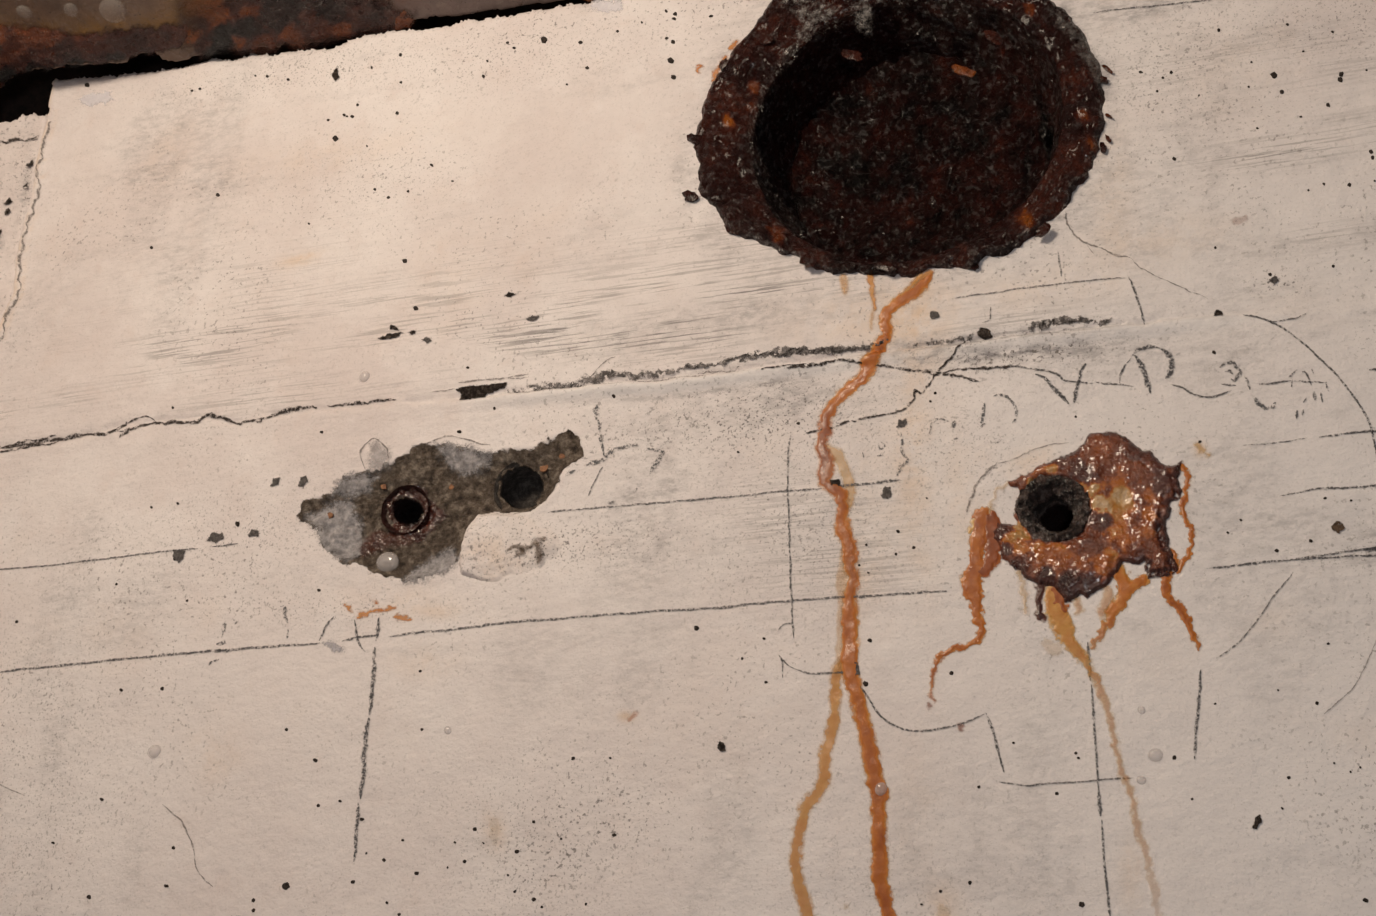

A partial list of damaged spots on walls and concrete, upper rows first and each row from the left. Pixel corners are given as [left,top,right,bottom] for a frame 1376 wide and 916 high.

corrosion [0,0,414,87]
corrosion [696,40,738,82]
corrosion [951,64,977,78]
corrosion [1100,113,1112,154]
crack [2,121,51,339]
crack [0,398,396,453]
crack [360,435,490,468]
crack [436,374,528,392]
crack [587,337,1010,433]
spalling [297,429,584,583]
corrosion [790,261,933,916]
corrosion [930,431,1201,701]